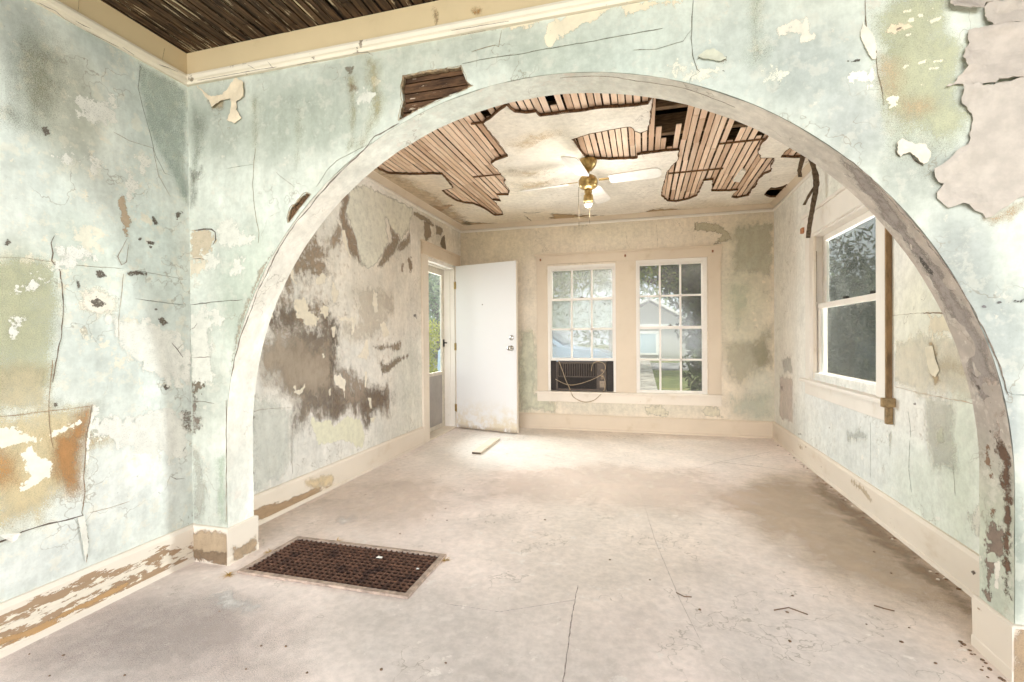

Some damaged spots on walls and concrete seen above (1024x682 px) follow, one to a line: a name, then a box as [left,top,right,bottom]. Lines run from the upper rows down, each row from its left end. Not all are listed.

peeling [503,0,683,47]
peeling [197,77,244,123]
spalling [398,65,472,121]
spalling [377,97,800,216]
peeling [886,95,899,109]
peeling [895,0,1024,218]
flaking render [844,162,1024,400]
crack [0,237,129,562]
water stain [253,195,413,491]
peeling [982,413,1013,602]
peeling [0,542,194,648]